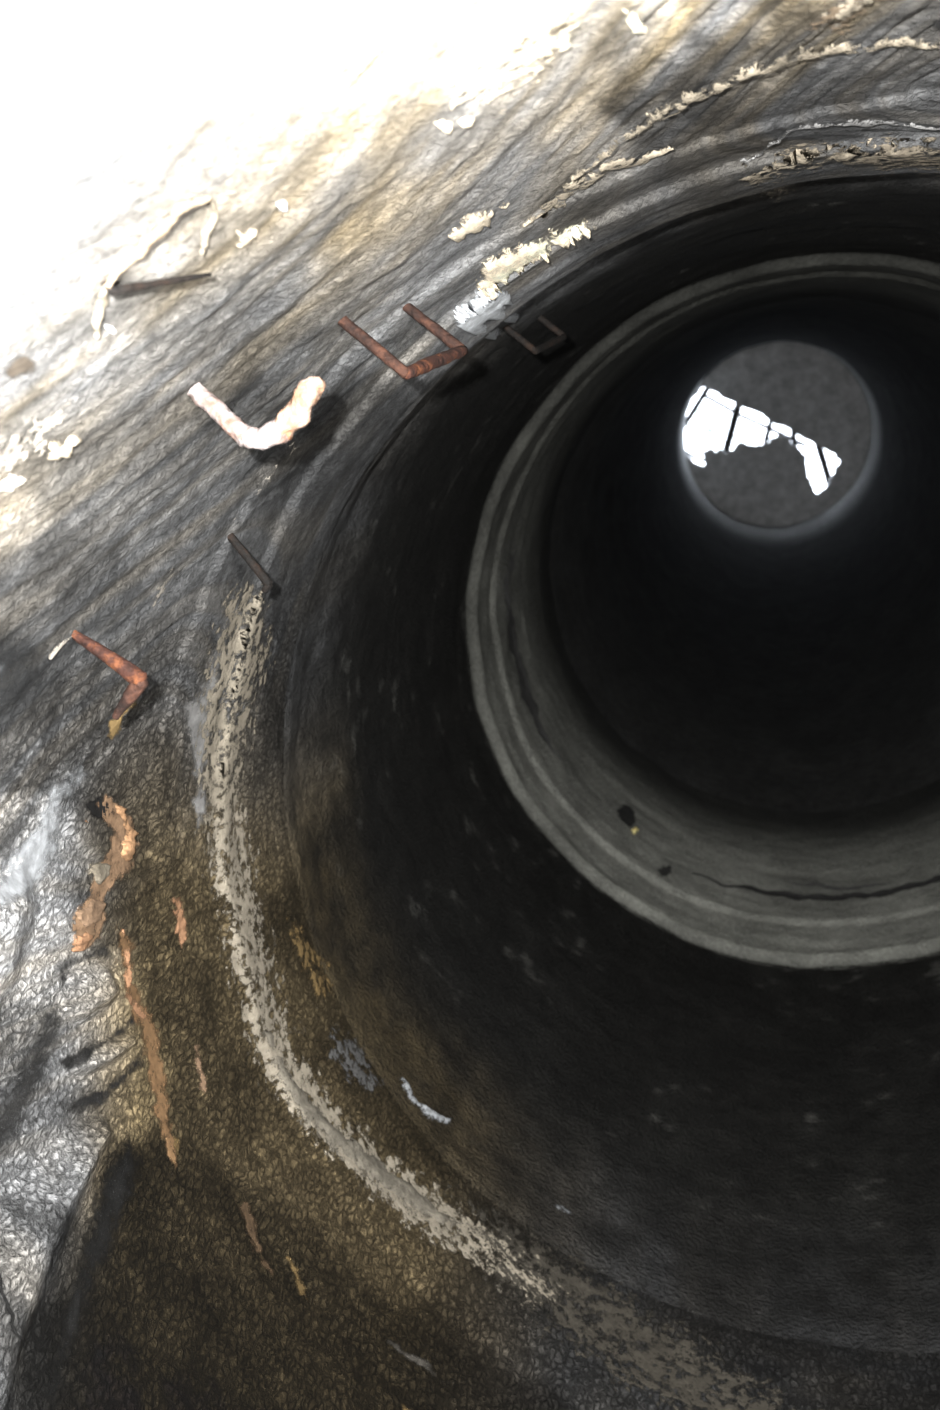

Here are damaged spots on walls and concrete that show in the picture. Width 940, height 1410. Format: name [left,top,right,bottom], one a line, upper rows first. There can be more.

peeling [623,9,647,34]
flaking render [810,0,883,35]
peeling [434,0,583,134]
water stain [742,132,940,202]
water stain [448,203,510,242]
water stain [453,220,591,340]
flaking render [6,356,35,378]
flaking render [0,399,82,493]
water stain [108,704,133,737]
flaking render [401,1076,451,1124]